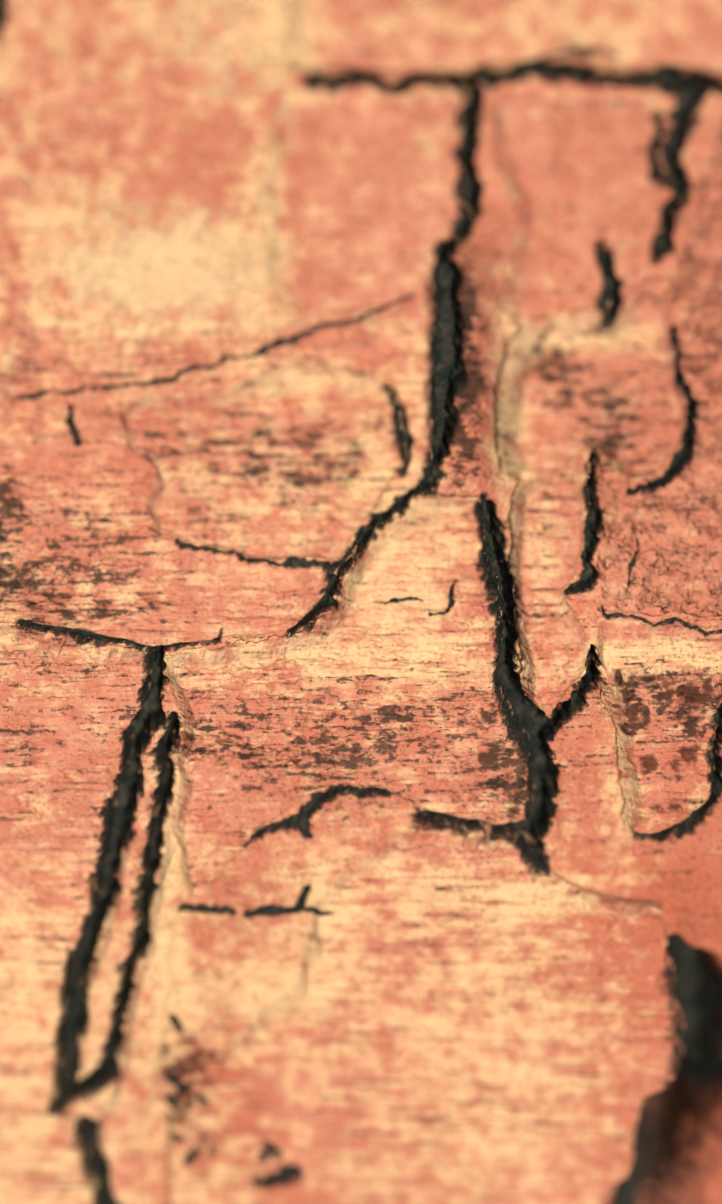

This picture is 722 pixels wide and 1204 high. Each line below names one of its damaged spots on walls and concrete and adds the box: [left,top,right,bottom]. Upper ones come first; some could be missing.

crack [0,0,8,43]
peeling [0,622,155,1204]
crack [16,619,333,1204]
peeling [0,81,476,646]
crack [12,47,722,638]
peeling [78,487,685,1204]
crack [244,493,606,881]
peeling [488,93,722,834]
crack [631,702,722,843]